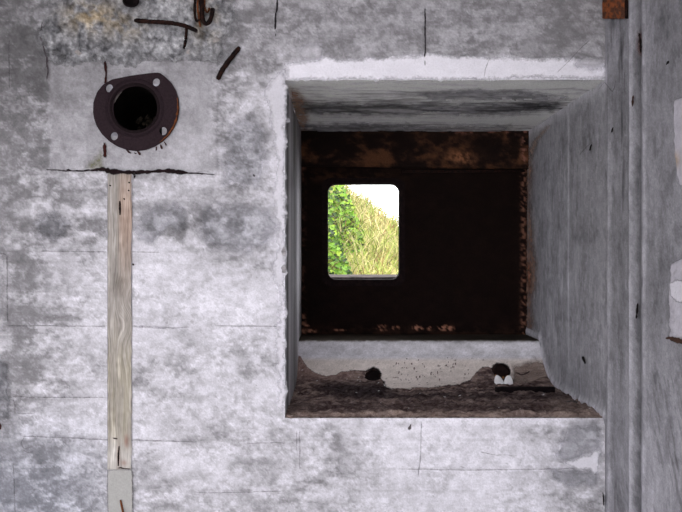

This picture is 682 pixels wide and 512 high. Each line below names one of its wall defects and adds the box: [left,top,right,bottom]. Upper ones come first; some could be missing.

crack [421,9,429,57]
rust [156,98,179,151]
flaking render [674,98,682,186]
crack [46,167,214,178]
flaking render [666,259,682,344]